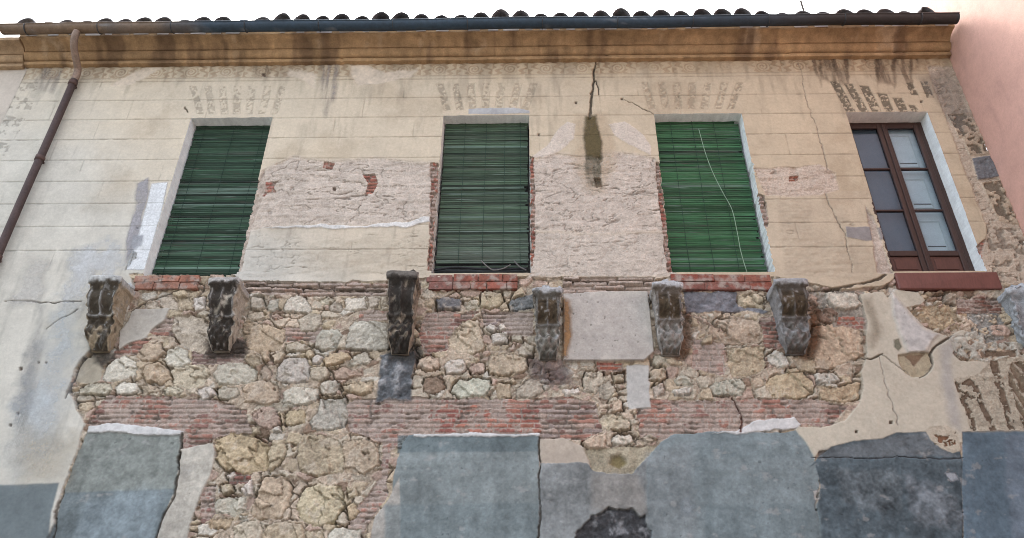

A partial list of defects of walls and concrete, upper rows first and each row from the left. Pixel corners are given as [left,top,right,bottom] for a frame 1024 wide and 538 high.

crack [589,63,654,118]
damp [875,59,918,81]
peeling [239,156,439,272]
damp [584,116,602,183]
peeling [529,121,676,278]
peeling [754,164,839,228]
crack [798,62,887,293]
spalling [927,66,1024,285]
crack [862,335,952,425]
spalling [898,351,932,377]
spalling [926,425,961,452]
spalling [576,506,652,538]